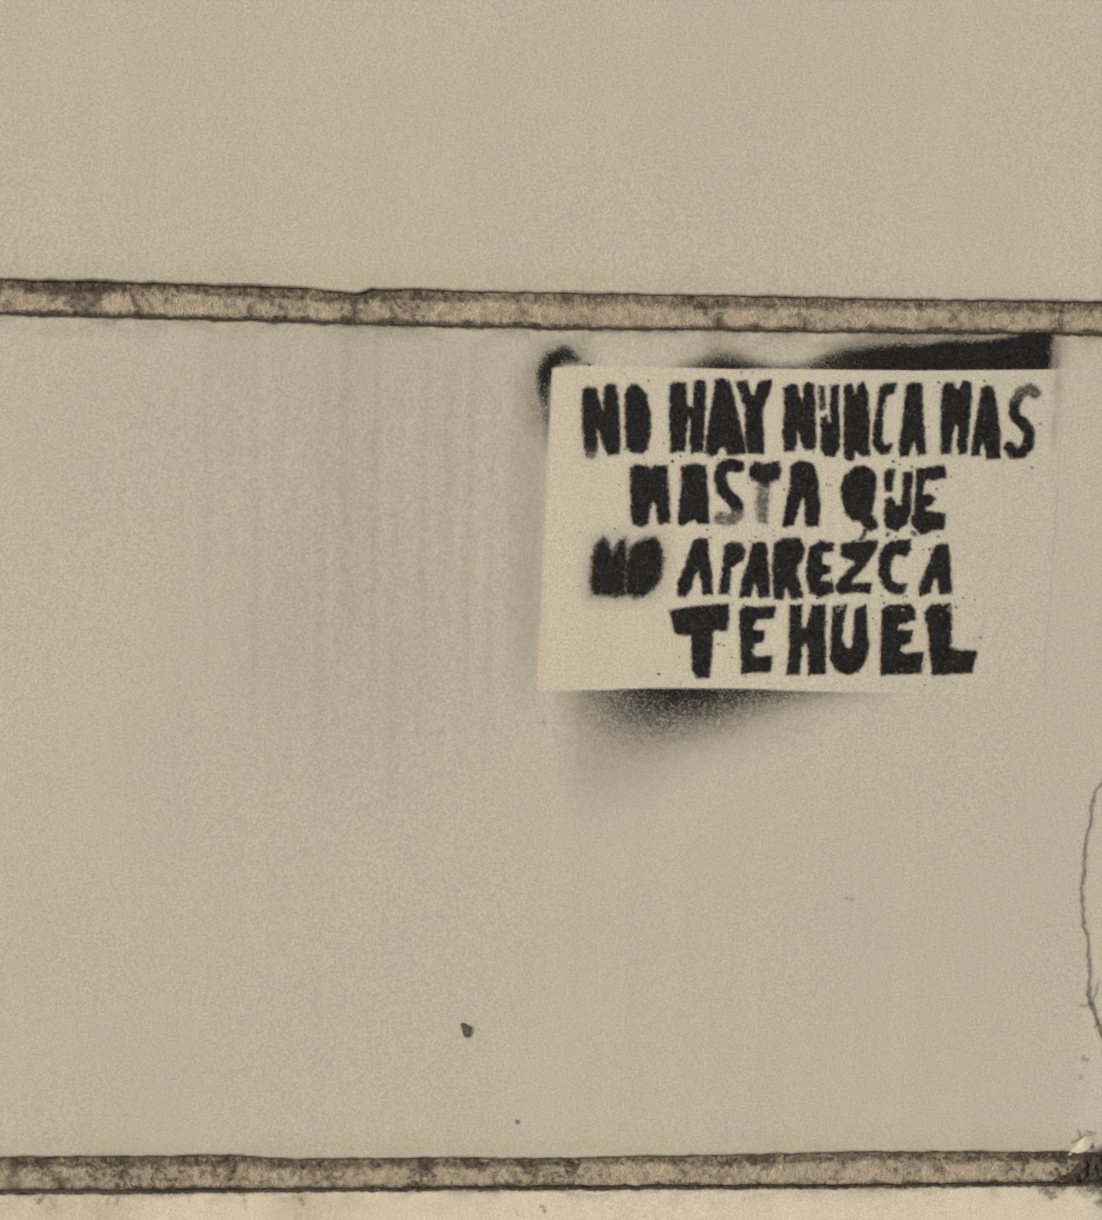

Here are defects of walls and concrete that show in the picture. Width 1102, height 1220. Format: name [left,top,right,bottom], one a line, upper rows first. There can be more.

crack [1080,797,1102,1037]